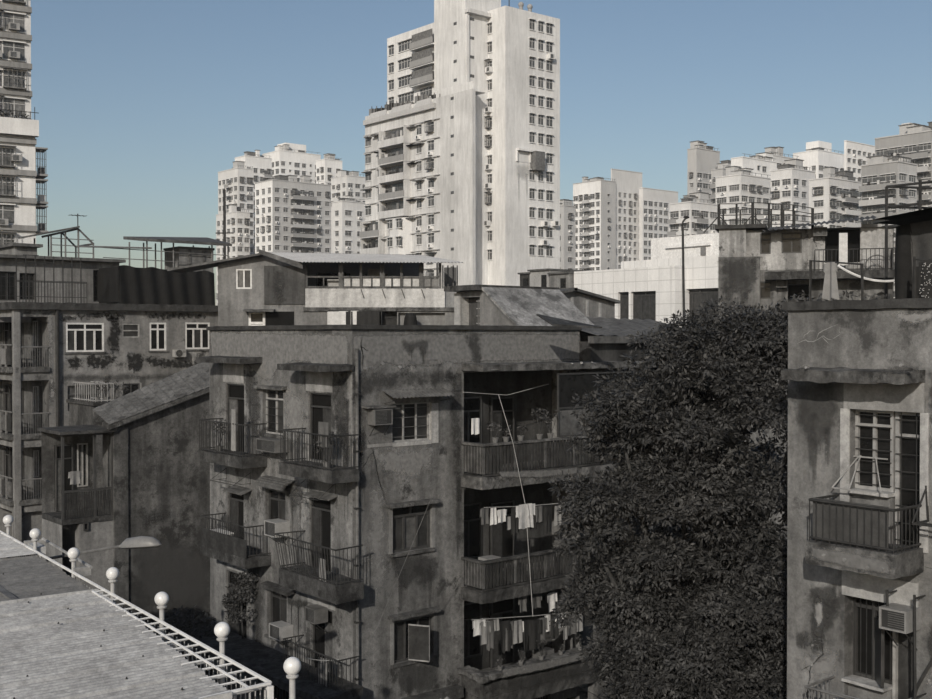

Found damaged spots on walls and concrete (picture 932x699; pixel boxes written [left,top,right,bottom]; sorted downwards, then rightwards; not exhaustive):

crack [801,324,840,343]
water stain [404,342,427,357]
water stain [799,385,835,444]